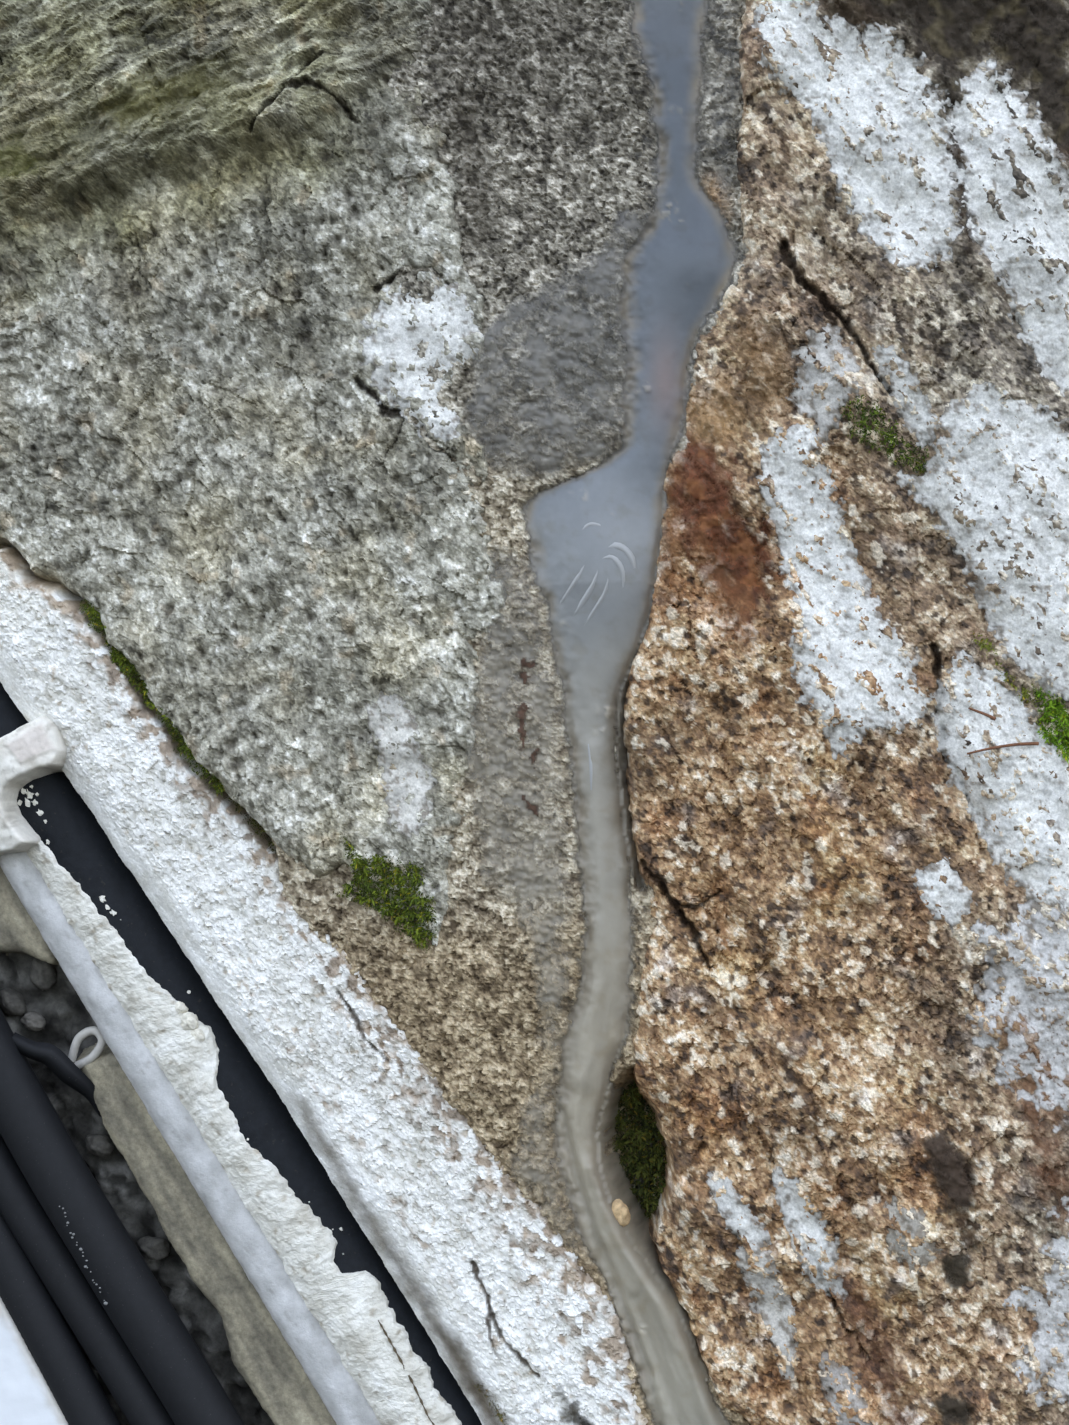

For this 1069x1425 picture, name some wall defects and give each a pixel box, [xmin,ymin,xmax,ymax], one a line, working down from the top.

crack [470,1260,540,1377]